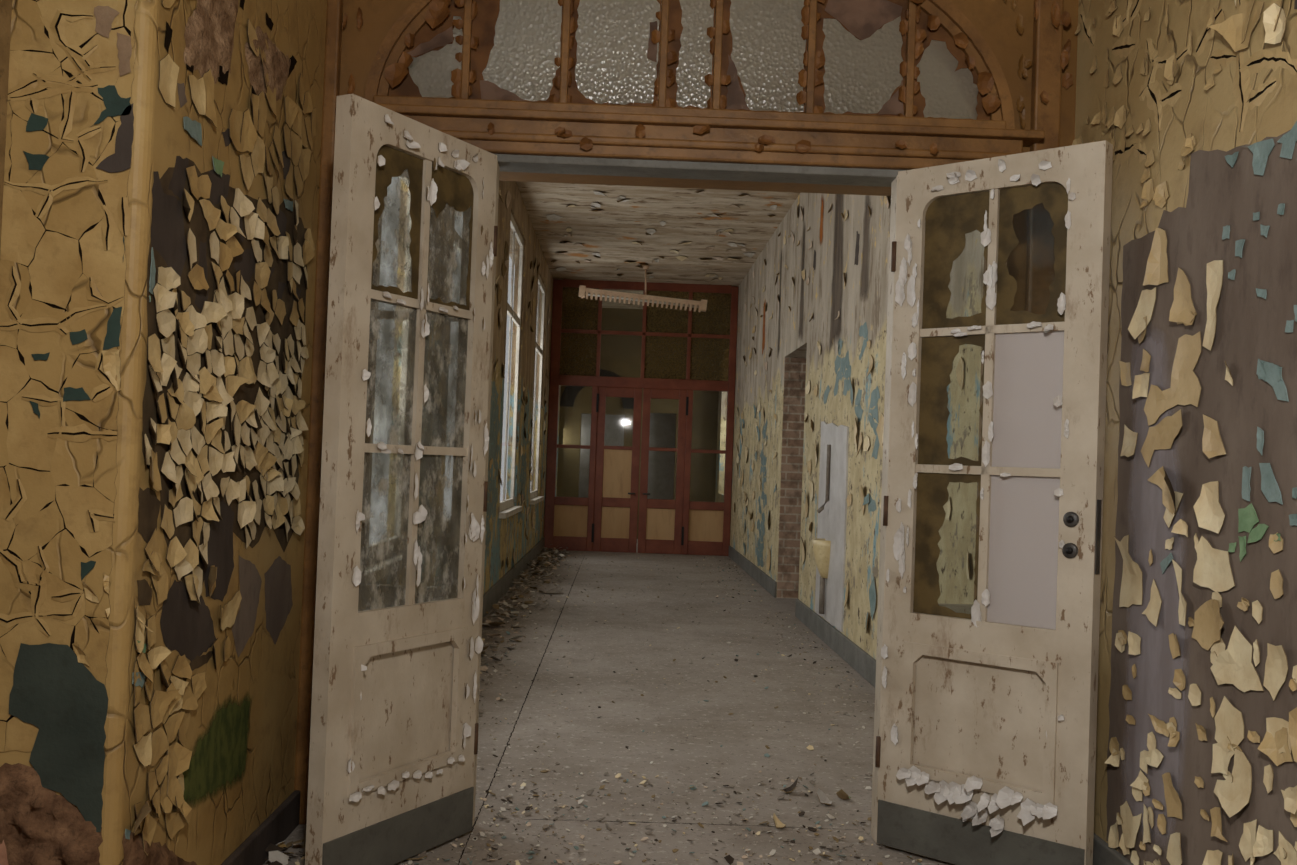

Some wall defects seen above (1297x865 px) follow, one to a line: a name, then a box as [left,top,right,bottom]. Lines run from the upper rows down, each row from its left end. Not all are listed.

flaking render [122,0,316,865]
crack [1080,0,1297,202]
flaking render [1105,121,1297,865]
peeling [1207,0,1297,52]